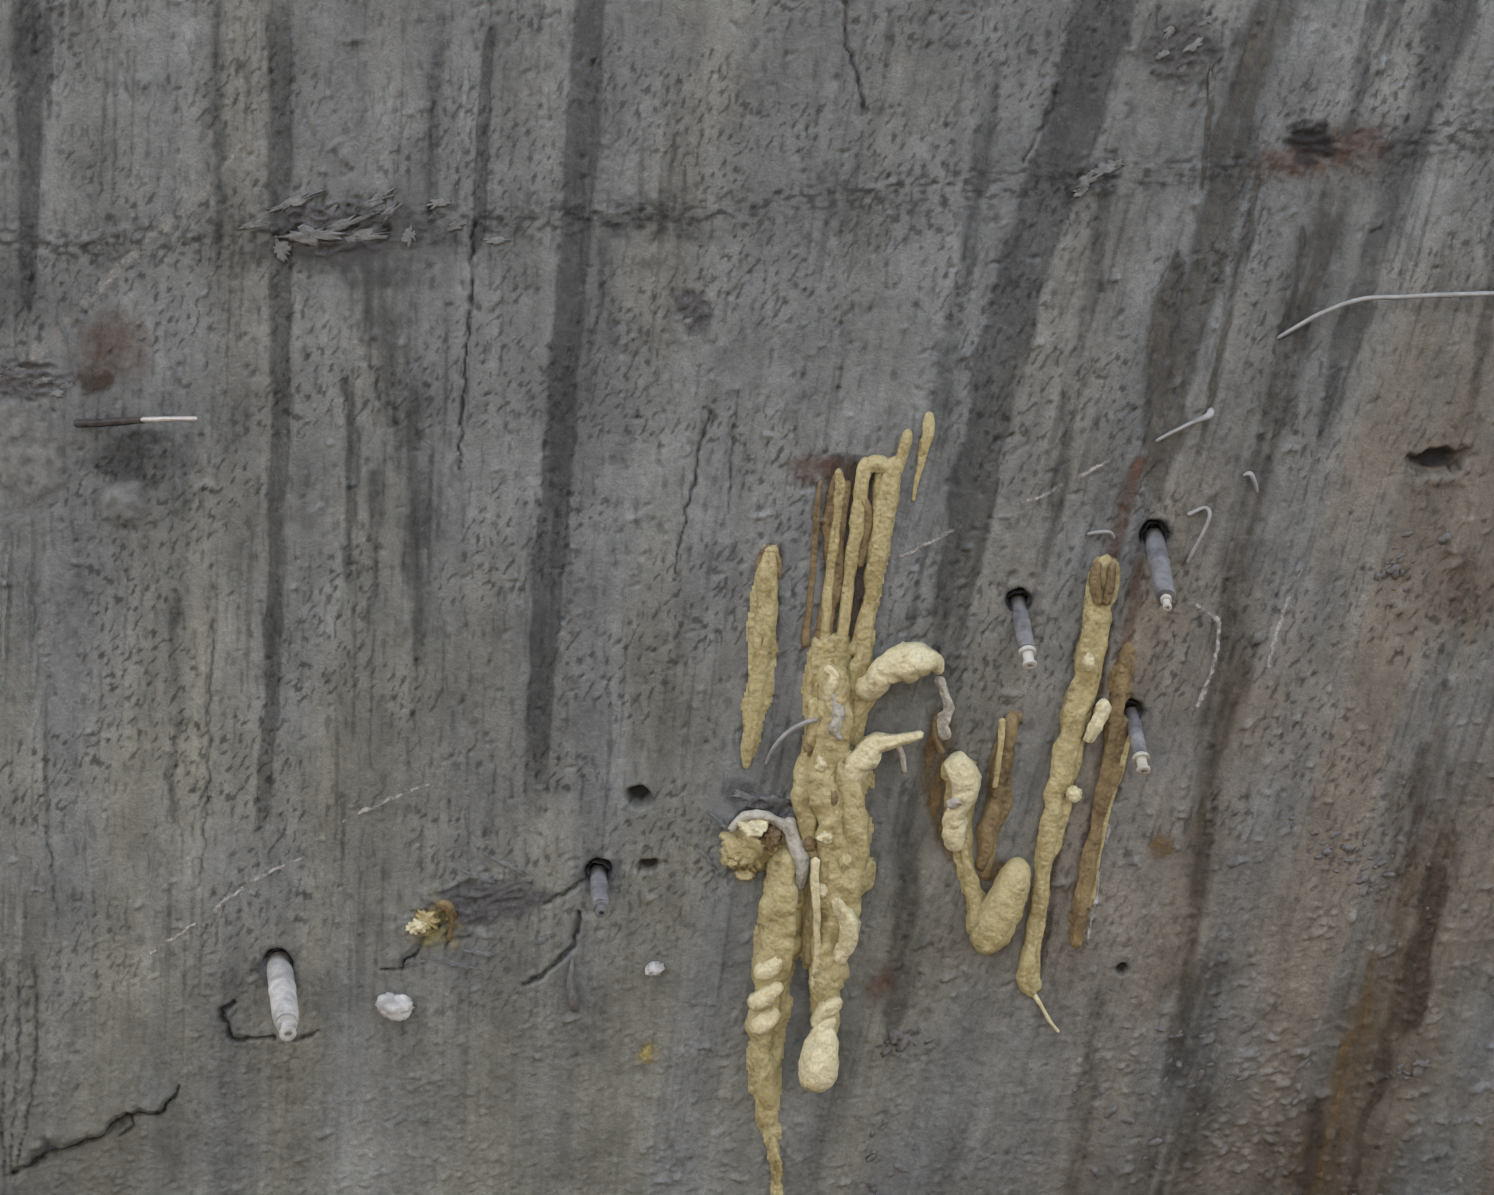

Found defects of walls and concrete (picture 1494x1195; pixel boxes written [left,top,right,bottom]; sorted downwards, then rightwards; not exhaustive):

spalling [238,188,416,263]
damp [526,0,692,767]
crack [11,1085,180,1174]
corrosion [1284,748,1454,1195]